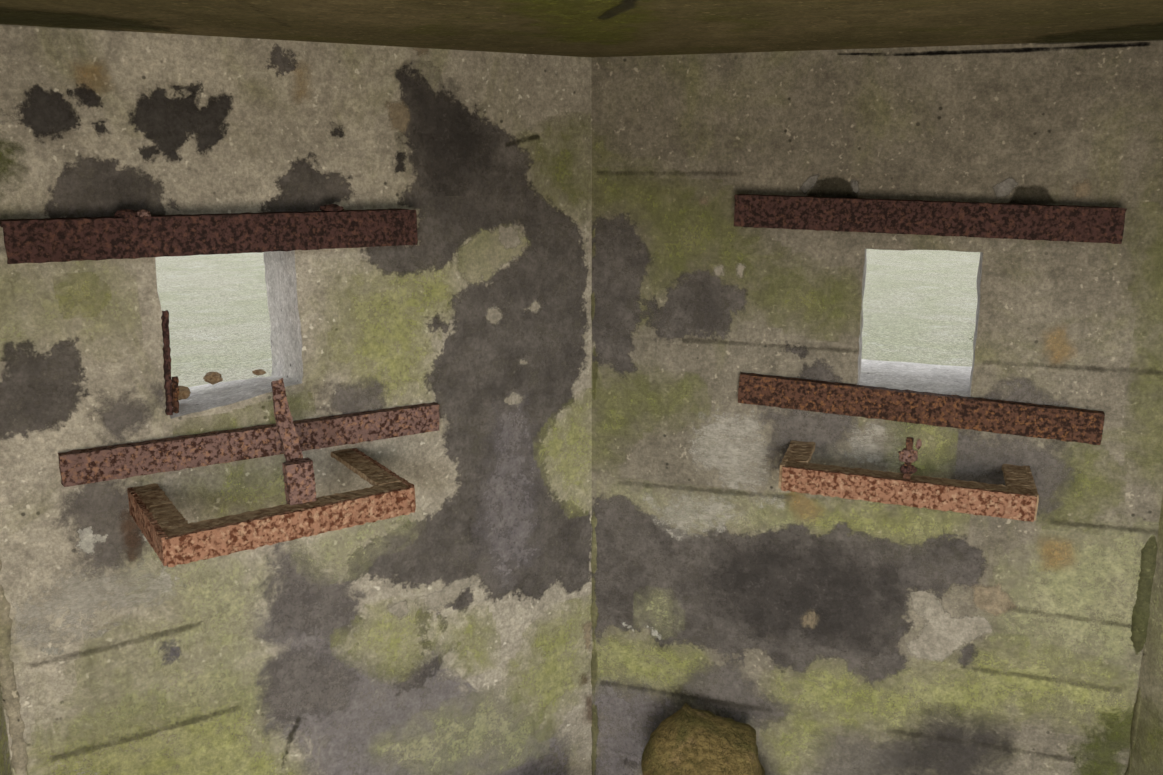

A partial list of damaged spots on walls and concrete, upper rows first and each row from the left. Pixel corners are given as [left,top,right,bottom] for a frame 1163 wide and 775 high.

water stain [16,84,108,143]
water stain [44,83,233,218]
water stain [0,337,89,440]
water stain [93,386,166,441]
water stain [257,63,1012,775]